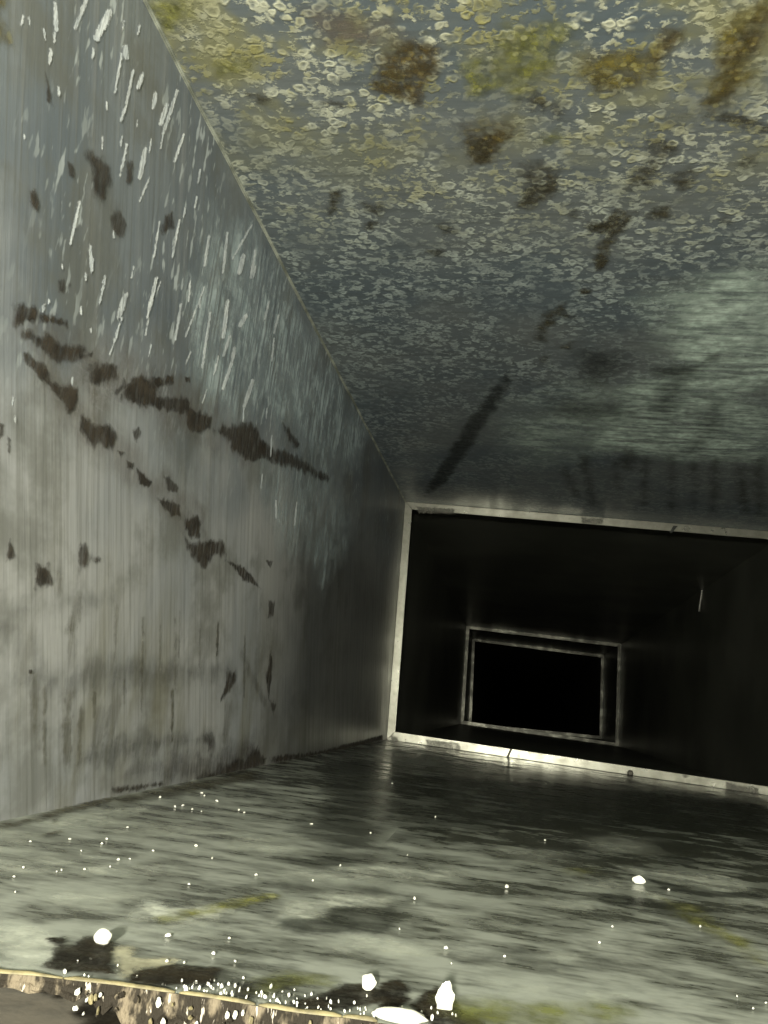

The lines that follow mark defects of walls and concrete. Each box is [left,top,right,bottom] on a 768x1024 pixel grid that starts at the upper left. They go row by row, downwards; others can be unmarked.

leakage [373,42,437,102]
leakage [583,32,679,89]
leakage [709,6,768,104]
leakage [721,115,768,131]